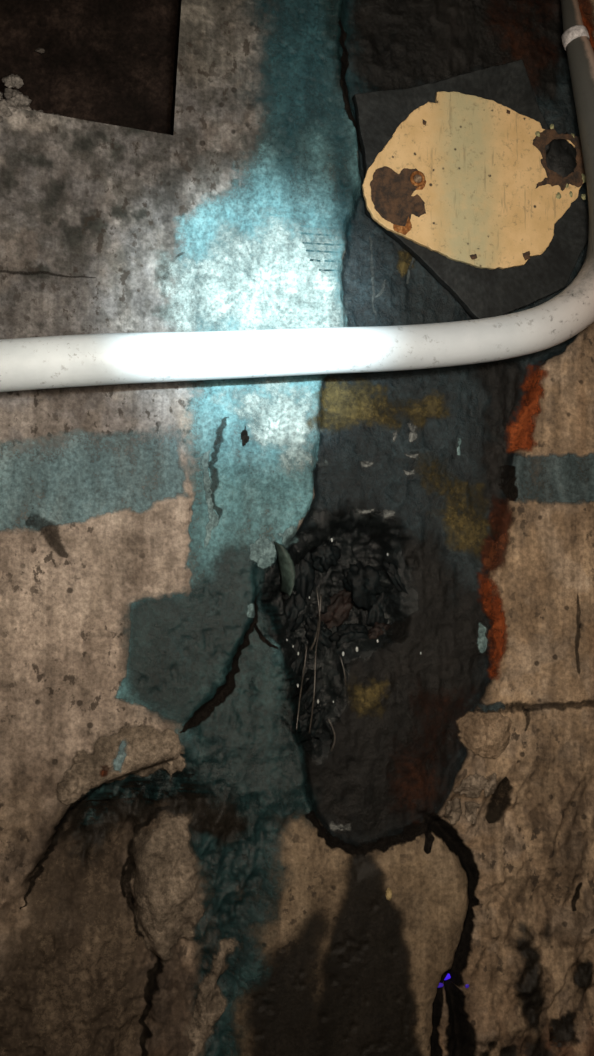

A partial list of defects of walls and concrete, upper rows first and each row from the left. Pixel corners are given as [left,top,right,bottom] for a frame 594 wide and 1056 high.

rust [508,366,548,451]
crack [180,593,278,762]
crack [476,700,594,731]
crack [574,593,582,674]
crack [20,780,124,910]
water stain [81,546,422,1056]
crack [120,806,173,1056]